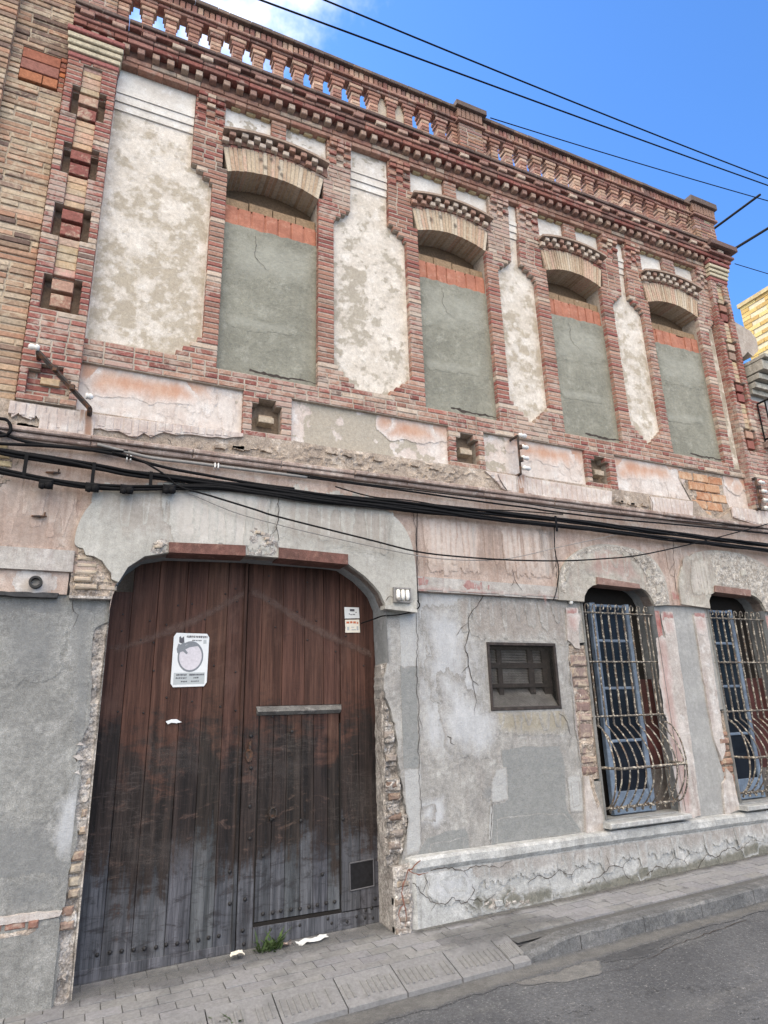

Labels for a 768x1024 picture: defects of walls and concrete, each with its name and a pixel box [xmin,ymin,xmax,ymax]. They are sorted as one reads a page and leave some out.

peeling [102,401,507,490]
spalling [678,470,729,517]
spalling [560,546,669,604]
crack [456,596,483,715]
spalling [12,548,118,1006]
spalling [374,664,414,936]
crack [398,616,509,926]
spalling [568,644,600,809]
crack [528,839,762,890]